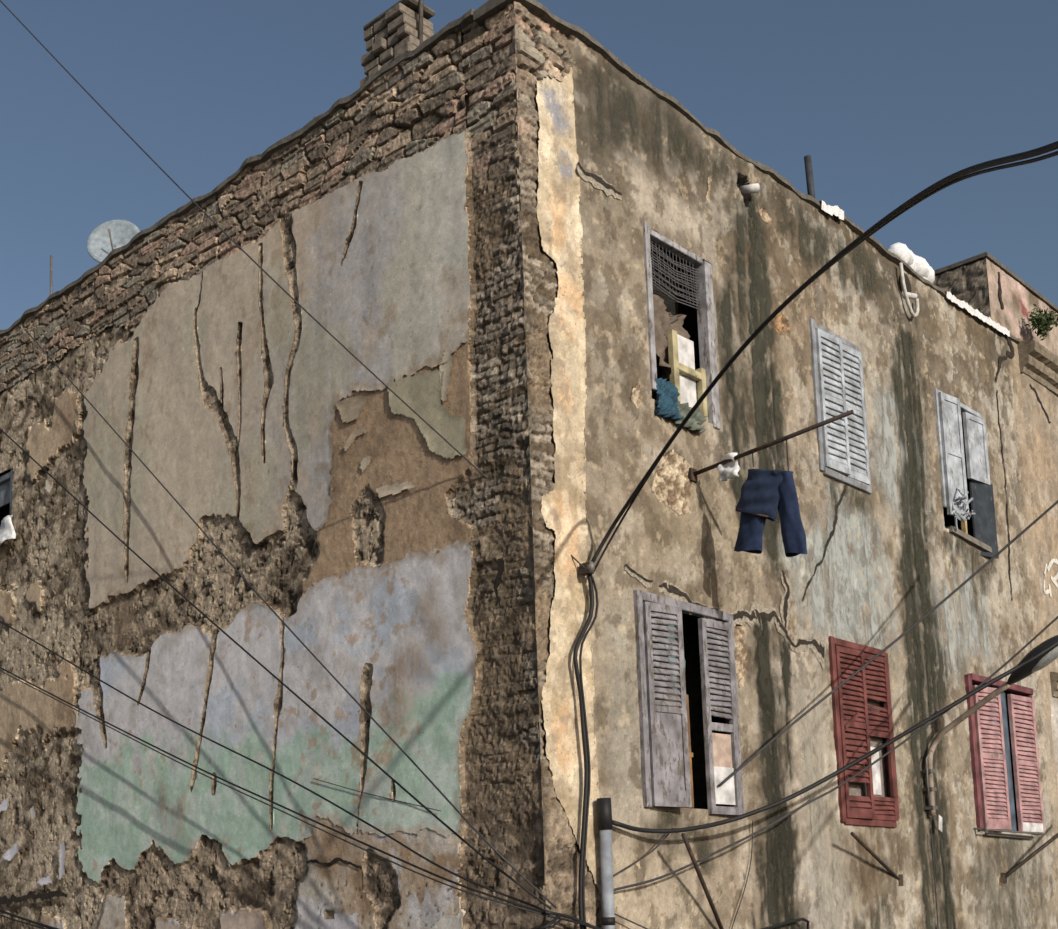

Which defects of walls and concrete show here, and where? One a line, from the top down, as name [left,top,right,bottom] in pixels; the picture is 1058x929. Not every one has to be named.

peeling [0,1,602,929]
spalling [652,449,693,516]
crack [625,483,849,669]
leakage [716,195,785,499]
leakage [763,508,780,571]
leakage [753,619,806,929]
leakage [891,329,957,929]